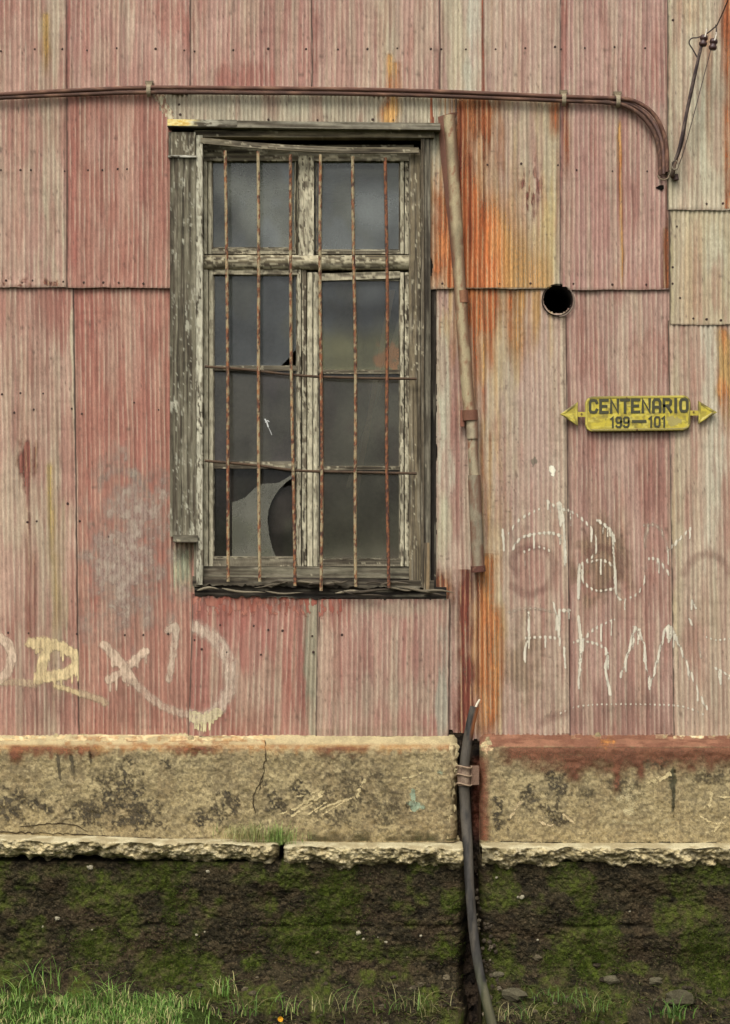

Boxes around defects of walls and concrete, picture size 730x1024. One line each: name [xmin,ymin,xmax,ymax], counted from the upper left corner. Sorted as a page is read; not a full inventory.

rust [433,0,545,407]
rust [436,554,502,733]
rust [7,745,97,761]
damp [0,752,167,831]
rust [144,746,217,755]
damp [187,790,240,827]
crack [252,741,268,815]
rust [317,746,366,754]
damp [493,796,509,832]
damp [520,771,593,827]
damp [491,733,730,812]
damp [609,777,648,823]